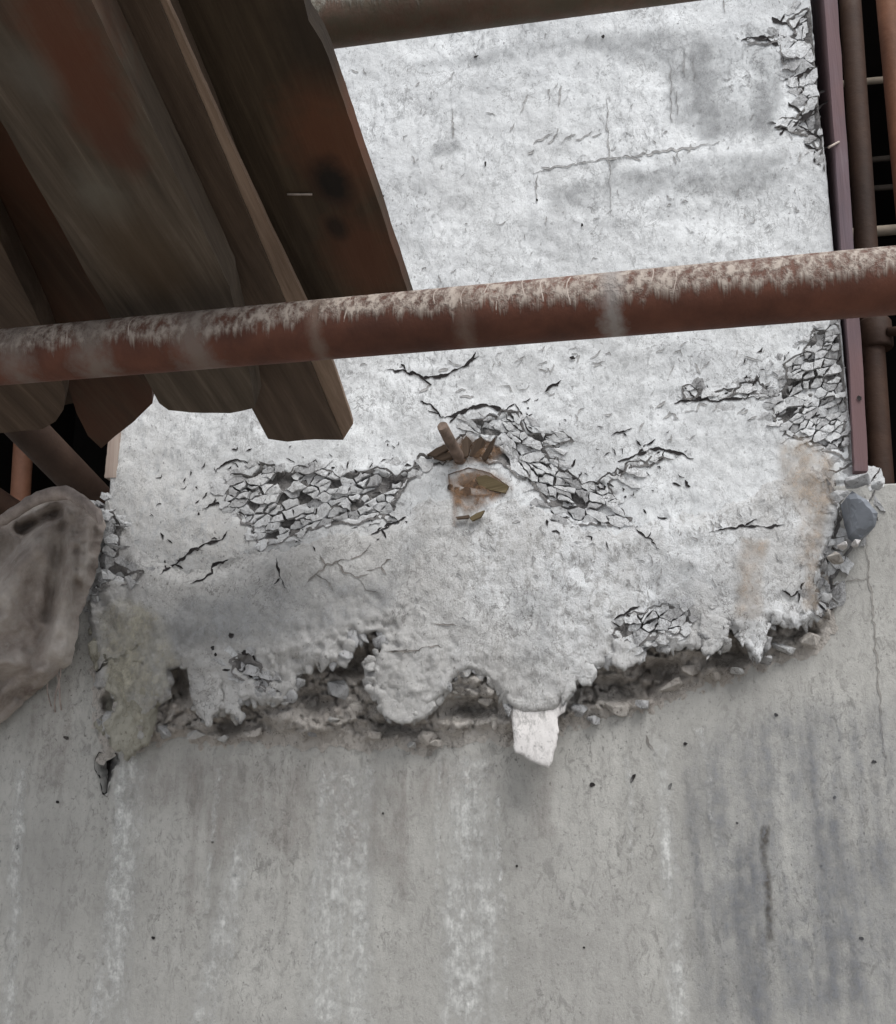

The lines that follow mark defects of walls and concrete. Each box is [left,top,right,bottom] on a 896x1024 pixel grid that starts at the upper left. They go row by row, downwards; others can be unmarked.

crack [736,11,830,219]
spalling [83,492,155,612]
crack [151,440,412,593]
corrosion [448,442,500,509]
crack [360,320,851,655]
spalling [558,319,886,736]
spalling [88,666,129,797]
spalling [136,631,514,757]
damp [661,811,672,888]